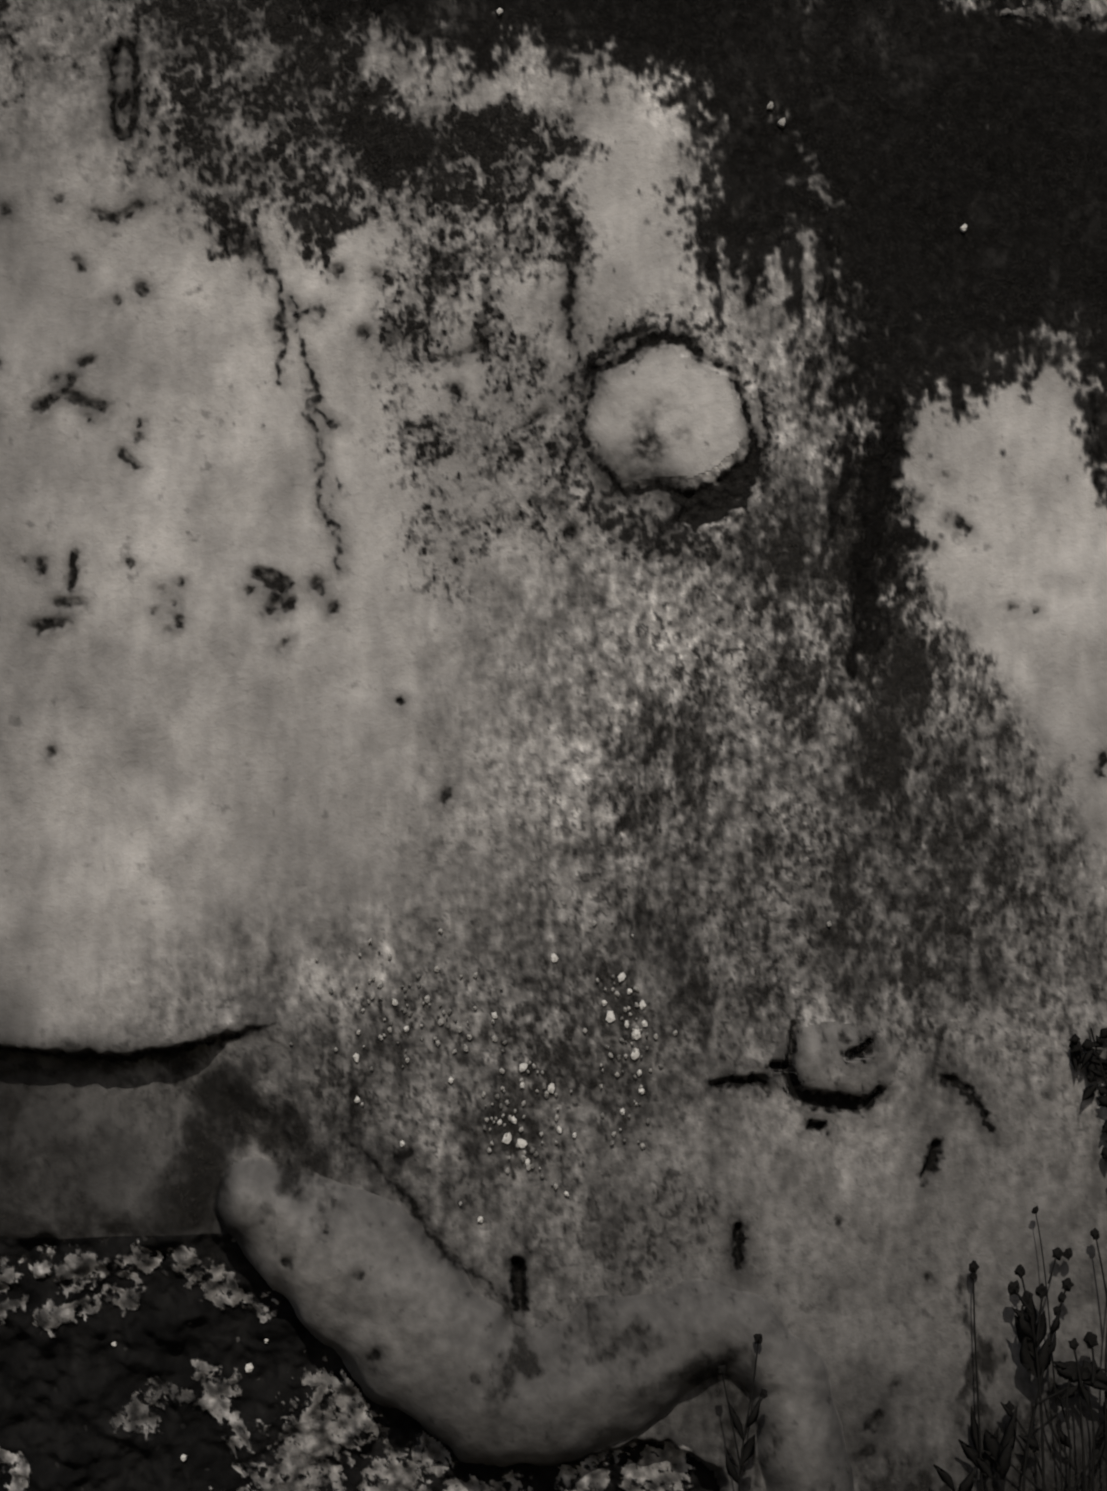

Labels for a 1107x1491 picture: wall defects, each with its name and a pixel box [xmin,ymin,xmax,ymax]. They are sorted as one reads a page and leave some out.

water stain [0,0,22,70]
crack [262,256,343,569]
water stain [104,0,1107,1182]
crack [0,1023,275,1063]
crack [939,1072,996,1132]
water stain [564,1170,717,1291]